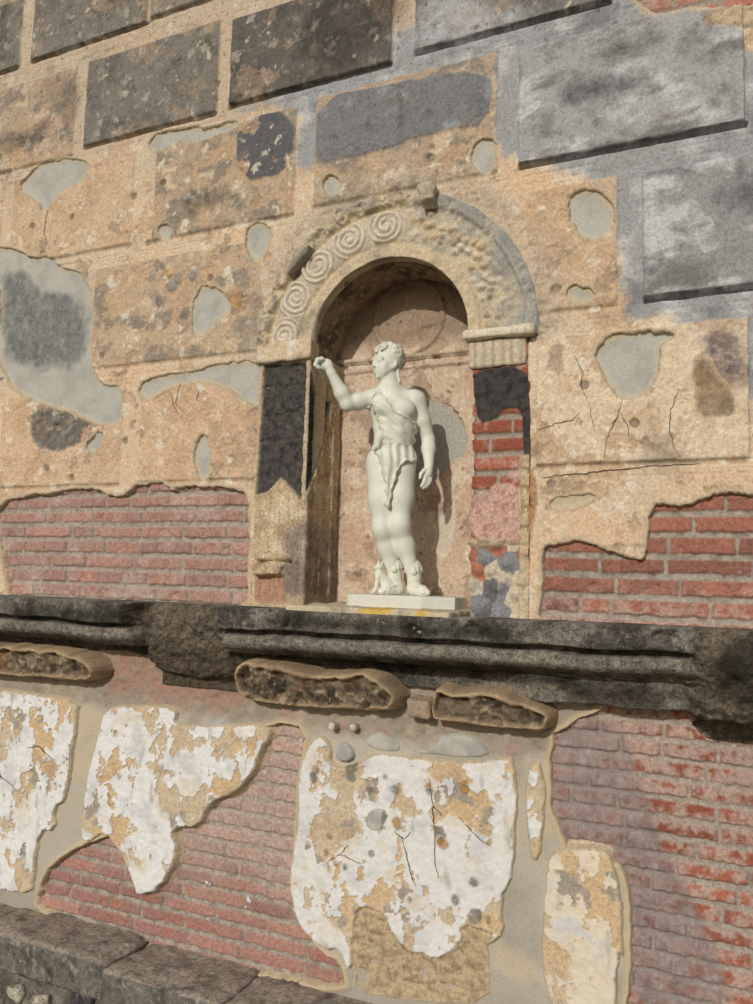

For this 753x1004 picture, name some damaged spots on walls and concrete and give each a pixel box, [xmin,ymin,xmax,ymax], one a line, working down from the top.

crack [542,355,697,478]
flaking render [0,483,251,605]
flaking render [541,494,753,629]
flaking render [0,688,753,1004]